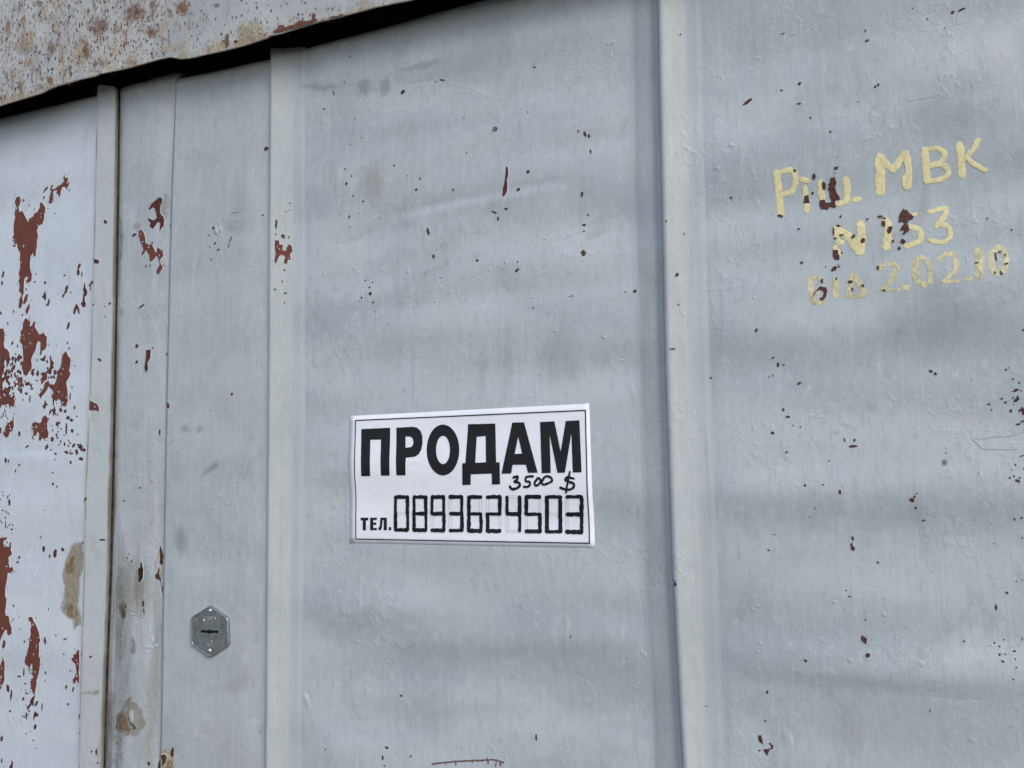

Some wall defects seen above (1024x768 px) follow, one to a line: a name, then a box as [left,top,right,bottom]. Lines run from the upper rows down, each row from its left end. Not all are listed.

rust [0,0,278,99]